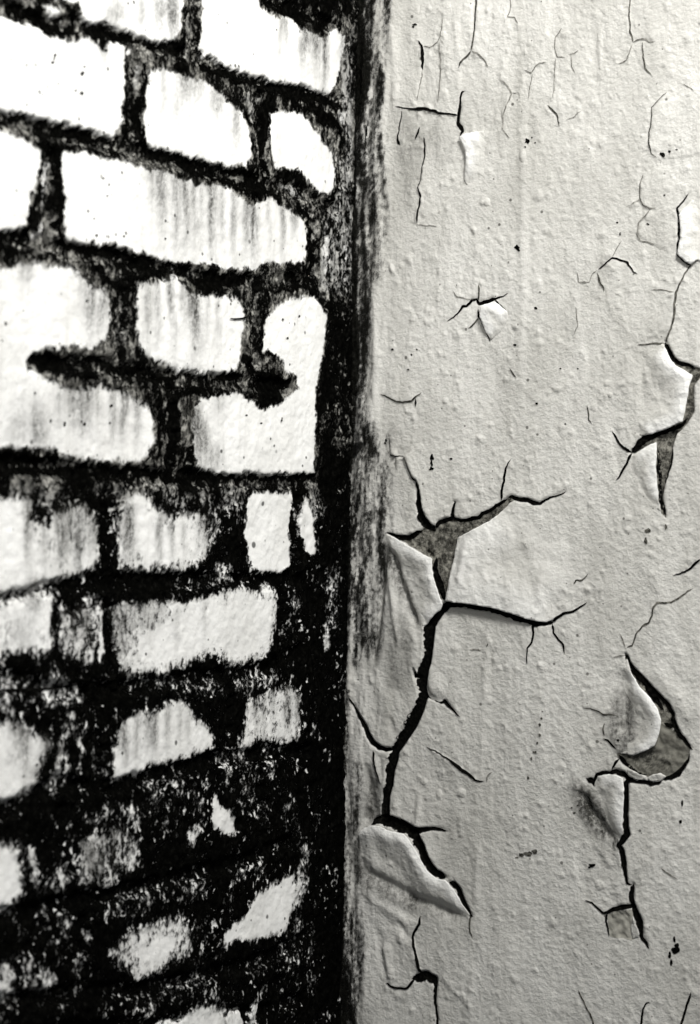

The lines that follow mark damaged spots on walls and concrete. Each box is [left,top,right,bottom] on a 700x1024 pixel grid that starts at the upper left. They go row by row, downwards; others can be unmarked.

crack [395,0,579,227]
crack [577,0,695,369]
peeling [479,301,508,340]
crack [386,439,565,540]
peeling [385,497,587,626]
peeling [630,343,700,530]
crack [348,557,588,936]
peeling [571,653,690,842]
crack [584,559,700,948]
crack [386,917,439,1024]
peeling [358,825,470,917]
peeling [608,909,640,940]